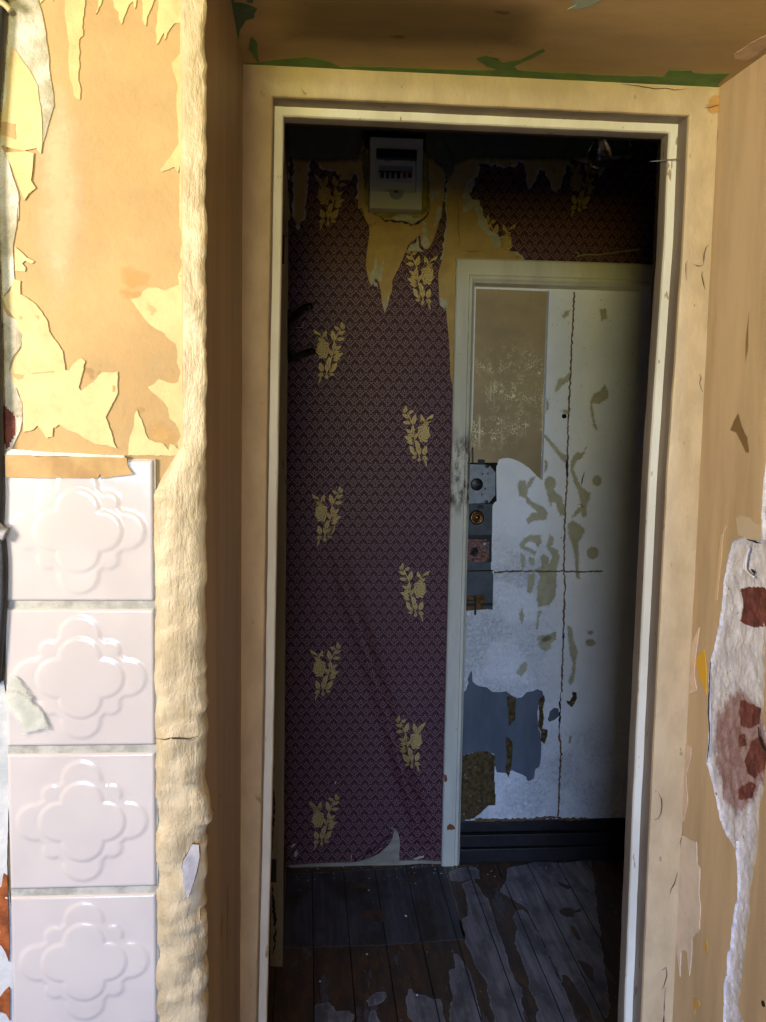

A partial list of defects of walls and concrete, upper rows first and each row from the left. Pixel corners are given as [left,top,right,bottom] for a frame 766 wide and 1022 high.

peeling [0,0,184,456]
peeling [689,627,707,694]
peeling [715,516,762,600]
flaking render [740,587,766,628]
flaking render [738,700,766,800]
flaking render [0,671,14,1022]
peeling [283,860,610,1022]
peeling [676,835,701,975]